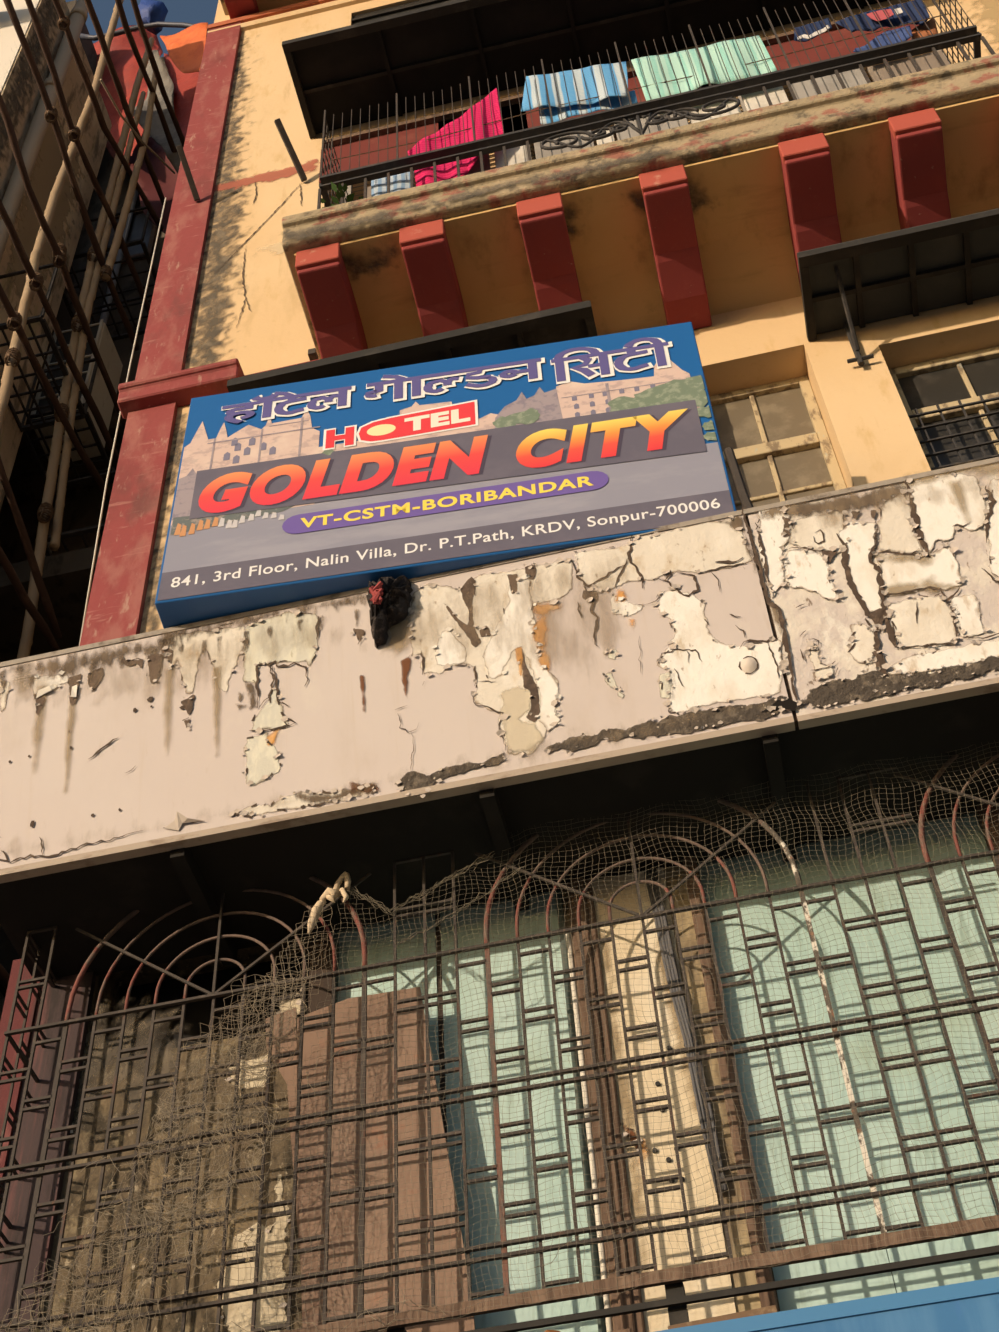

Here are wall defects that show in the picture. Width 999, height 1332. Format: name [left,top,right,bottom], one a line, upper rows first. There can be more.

damp [8,117,84,314]
damp [185,39,250,366]
crack [217,182,302,327]
damp [283,148,677,239]
damp [164,415,186,511]
peeling [33,668,104,715]
damp [66,703,74,775]
damp [0,528,278,743]
peeling [121,610,320,729]
peeling [242,688,289,786]
peeling [395,472,999,798]
peeling [228,783,376,818]